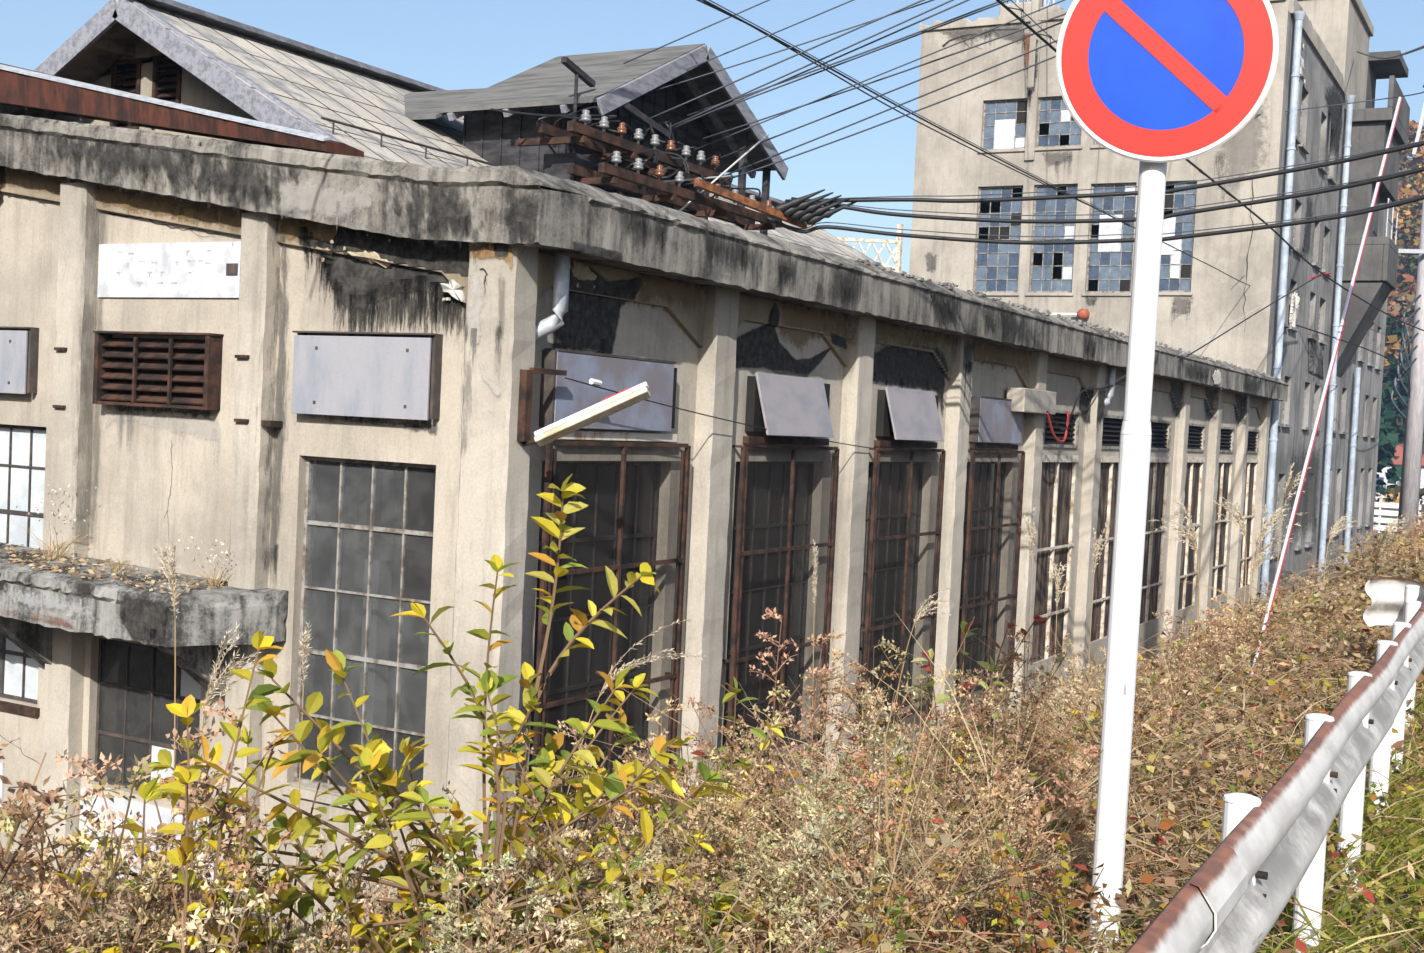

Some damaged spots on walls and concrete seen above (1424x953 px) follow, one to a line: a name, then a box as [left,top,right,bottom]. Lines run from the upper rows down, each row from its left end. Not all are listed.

damp [611,205,668,252]
peeling [314,234,391,268]
peeling [440,279,466,303]
peeling [570,260,597,288]
damp [553,242,702,354]
damp [704,224,864,376]
damp [926,253,936,271]
damp [0,573,89,617]
damp [120,595,167,643]